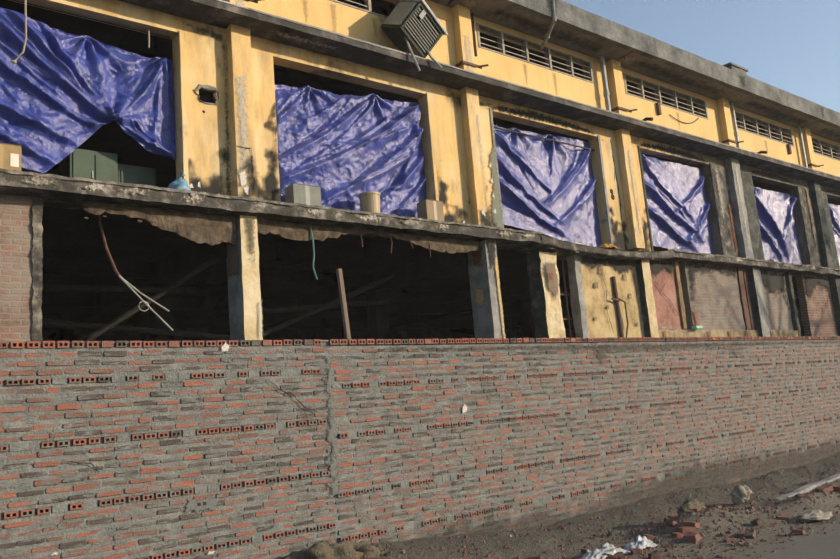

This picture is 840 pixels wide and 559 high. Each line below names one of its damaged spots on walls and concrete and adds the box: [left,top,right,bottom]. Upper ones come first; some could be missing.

spalling [82,193,236,246]
crack [270,381,320,417]